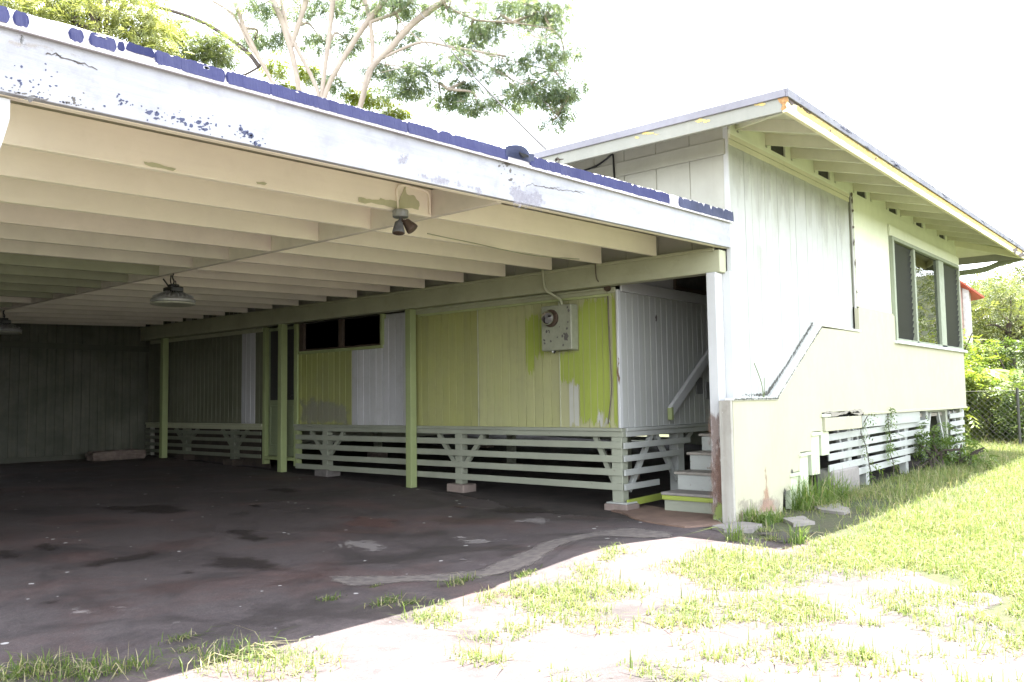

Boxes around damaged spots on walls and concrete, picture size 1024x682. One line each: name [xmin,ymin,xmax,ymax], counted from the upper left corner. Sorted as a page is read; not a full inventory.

crack [46,52,97,70]
peeling [1,63,266,147]
peeling [68,28,516,181]
peeling [358,187,420,210]